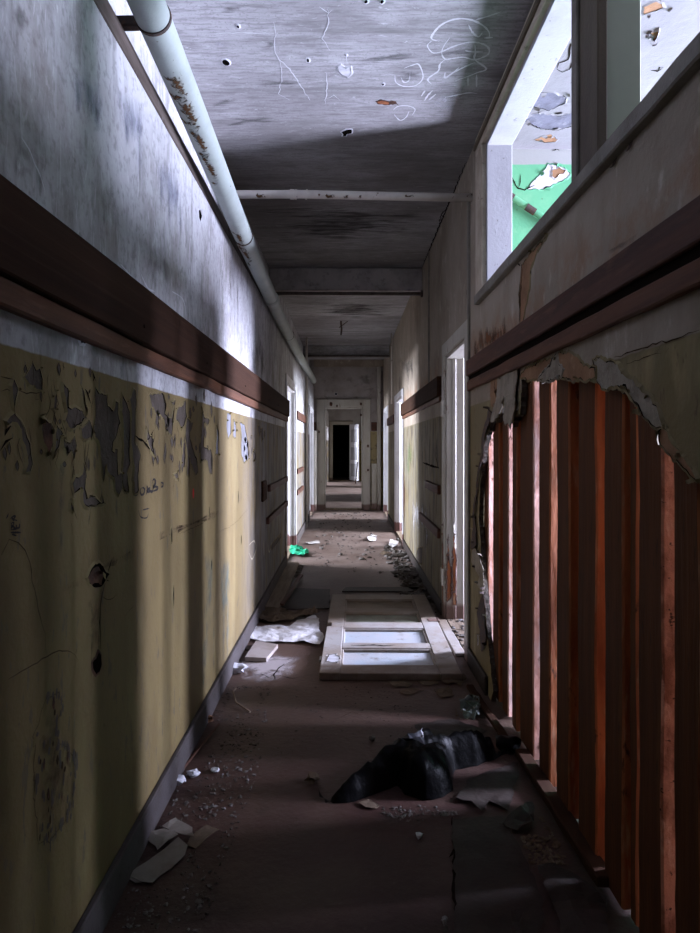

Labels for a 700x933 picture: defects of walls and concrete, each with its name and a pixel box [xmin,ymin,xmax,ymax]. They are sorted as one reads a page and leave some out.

corrosion [165,77,217,184]
peeling [524,91,571,143]
peeling [526,163,571,191]
peeling [22,359,263,519]
flaking render [519,350,700,484]
flaking render [85,559,112,677]
crack [449,818,457,911]